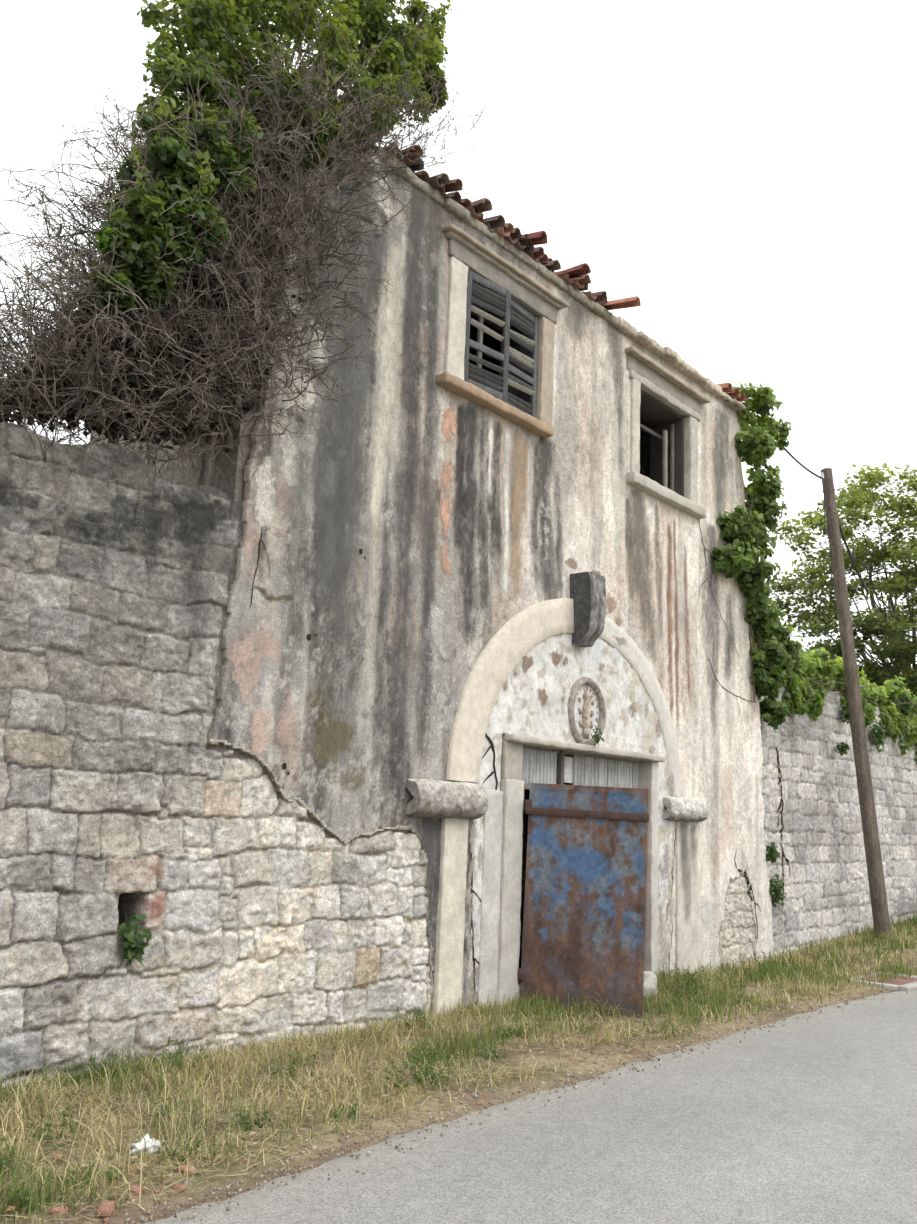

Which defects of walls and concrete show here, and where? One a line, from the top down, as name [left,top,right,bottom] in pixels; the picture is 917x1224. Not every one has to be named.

water stain [291,150,453,788]
peeling [438,461,453,573]
peeling [442,409,457,440]
water stain [454,406,510,634]
water stain [532,438,562,600]
water stain [626,490,661,655]
rust [668,520,689,715]
water stain [702,526,733,714]
water stain [713,413,729,509]
spalling [709,868,765,969]